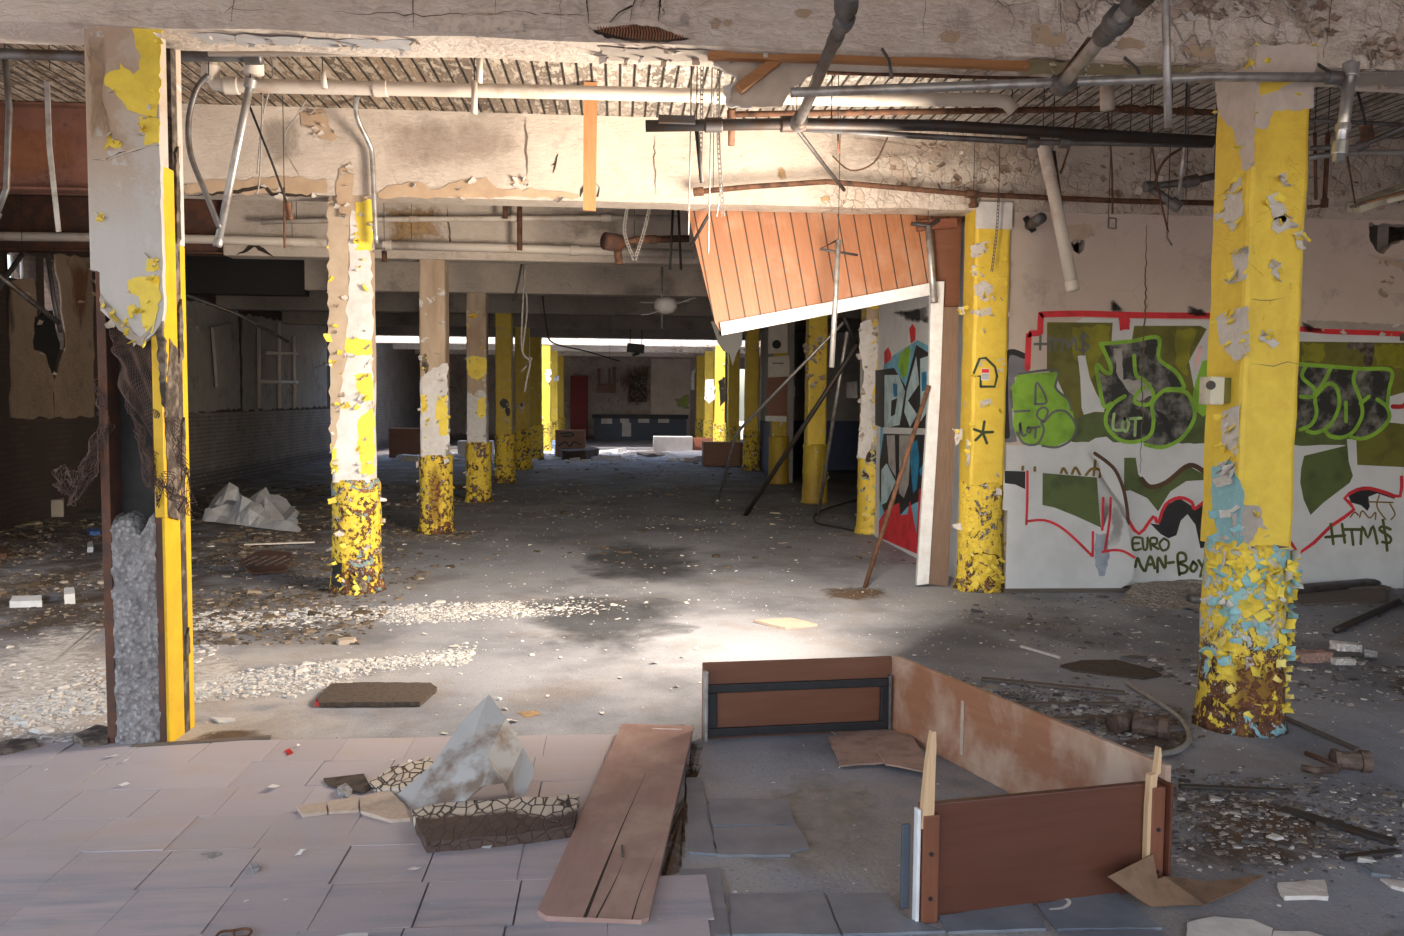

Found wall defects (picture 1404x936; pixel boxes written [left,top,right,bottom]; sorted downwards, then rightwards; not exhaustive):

crack [338,0,664,30]
peeling [77,290,152,348]
peeling [323,162,375,477]
peeling [538,356,559,384]
peeling [957,241,1010,334]
peeling [1210,306,1280,365]
peeling [416,353,526,502]
peeling [952,398,1003,466]
peeling [326,497,387,596]
peeling [1198,404,1304,727]